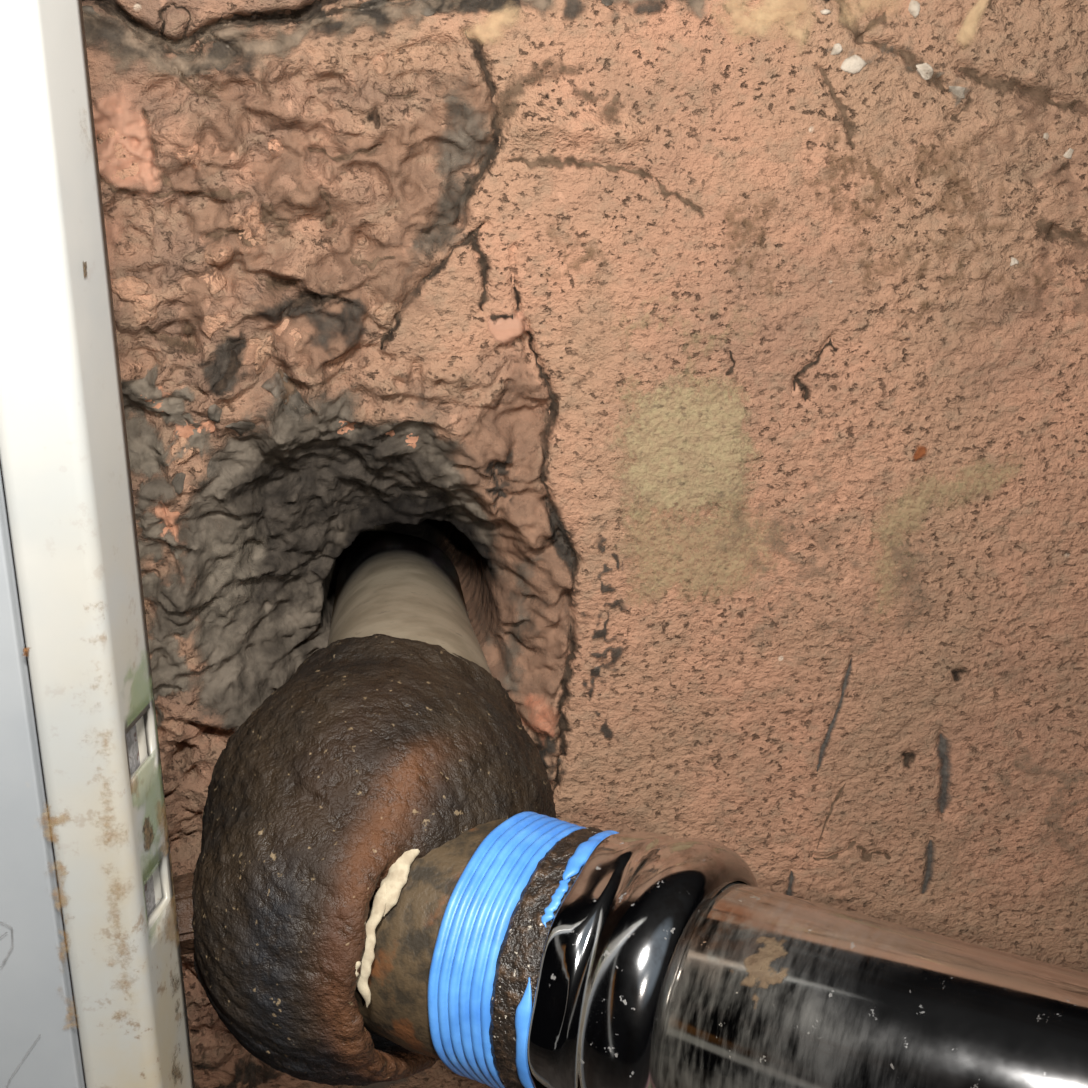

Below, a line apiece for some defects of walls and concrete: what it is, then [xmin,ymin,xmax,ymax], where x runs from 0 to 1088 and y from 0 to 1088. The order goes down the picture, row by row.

crack [81,0,353,58]
spalling [82,0,553,102]
spalling [564,0,583,18]
spalling [601,0,662,14]
peeling [93,94,159,190]
crack [100,108,182,198]
spalling [111,85,574,780]
crack [380,31,704,794]
spalling [582,526,625,698]
spalling [596,708,613,738]